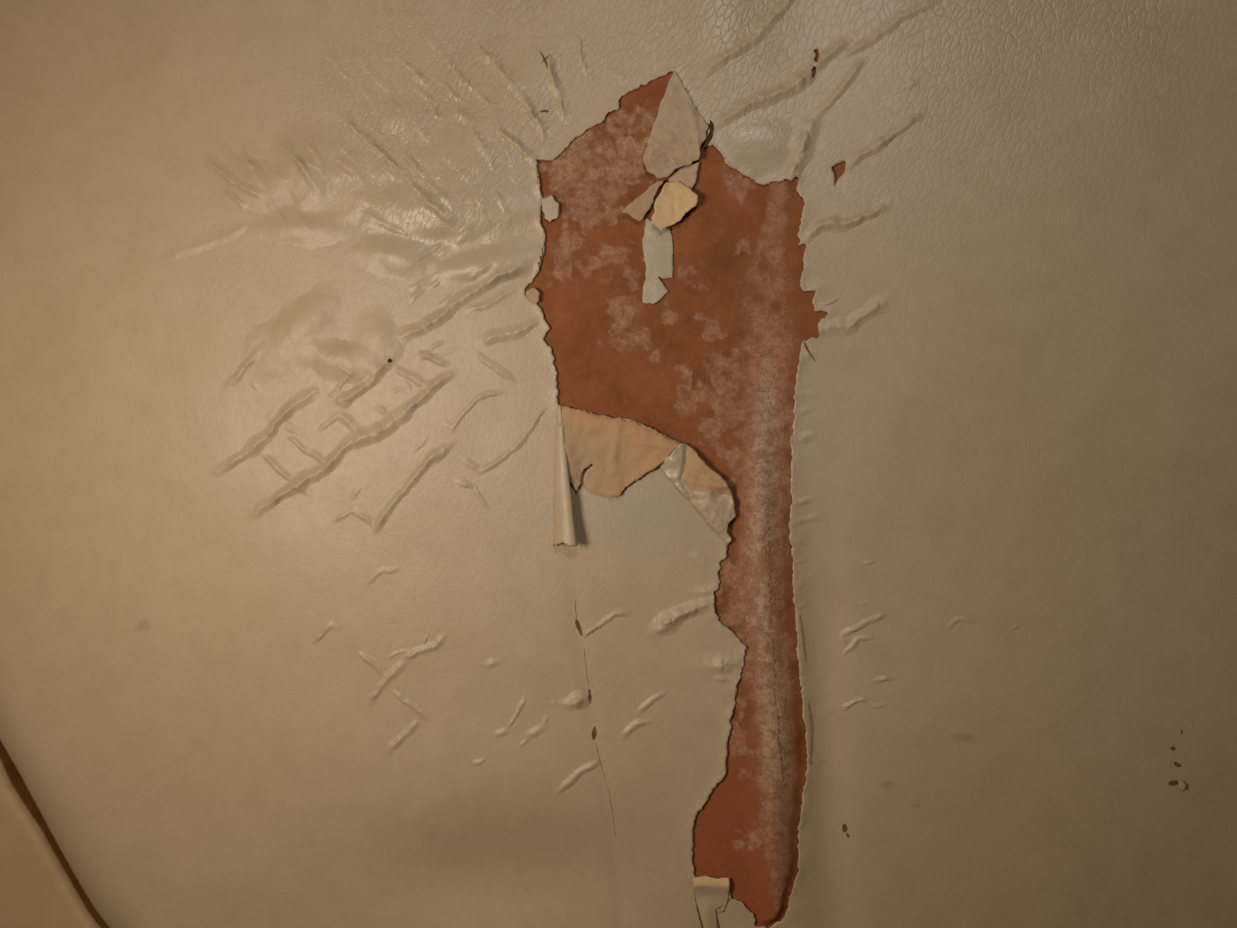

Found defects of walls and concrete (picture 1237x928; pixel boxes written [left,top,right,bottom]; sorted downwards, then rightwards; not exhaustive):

peeling [525,71,828,928]